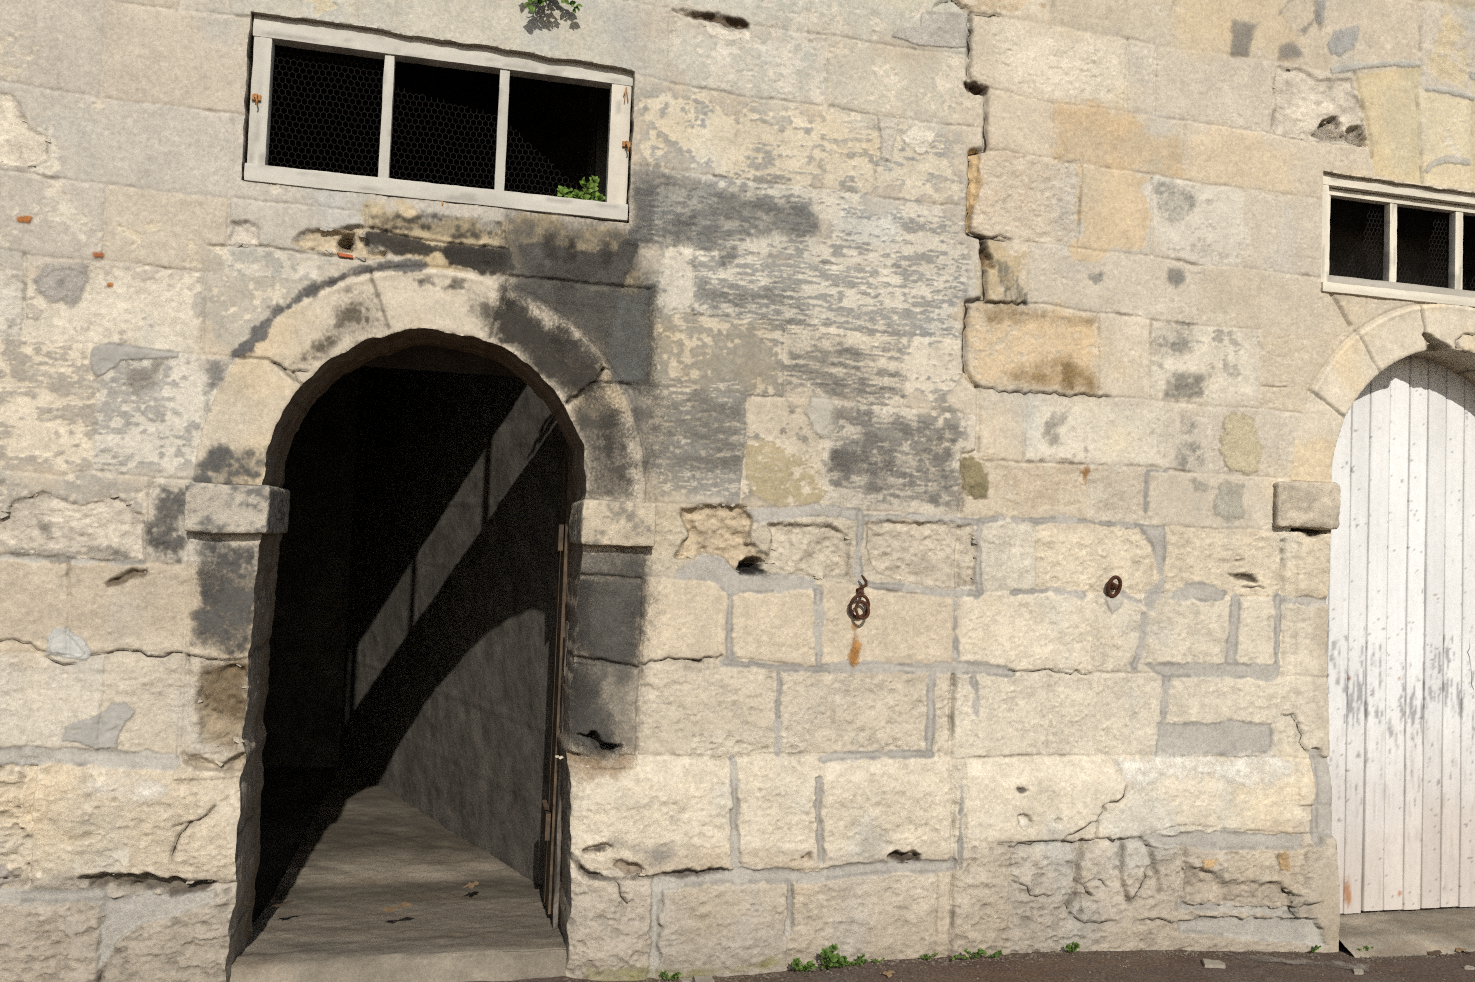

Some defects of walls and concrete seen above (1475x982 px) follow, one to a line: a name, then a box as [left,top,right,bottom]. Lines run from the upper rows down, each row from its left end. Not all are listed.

spalling [1271,67,1364,147]
spalling [675,504,978,588]
crack [0,640,246,666]
rust [849,624,861,664]
crack [172,806,215,854]
crack [1002,787,1172,924]